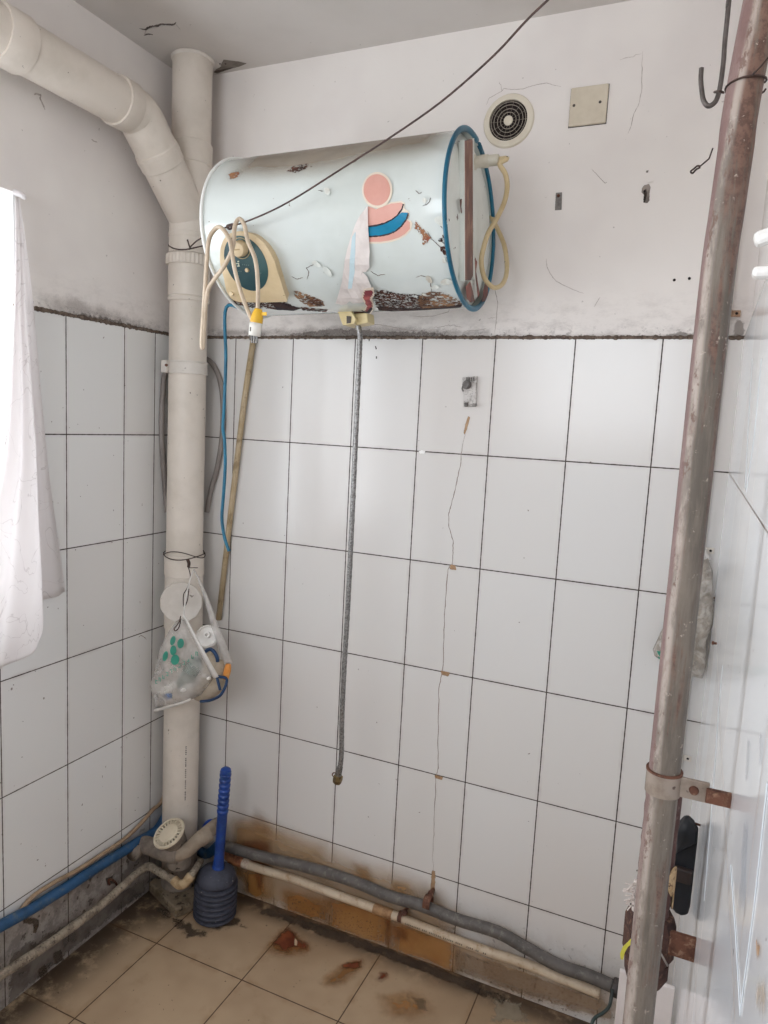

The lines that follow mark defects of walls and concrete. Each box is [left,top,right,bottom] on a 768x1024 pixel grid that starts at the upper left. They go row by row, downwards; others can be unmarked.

crack [139,22,180,36]
crack [431,416,470,889]
water stain [23,918,39,933]
corrosion [272,928,308,955]
corrosion [286,894,452,971]
corrosion [327,961,360,983]